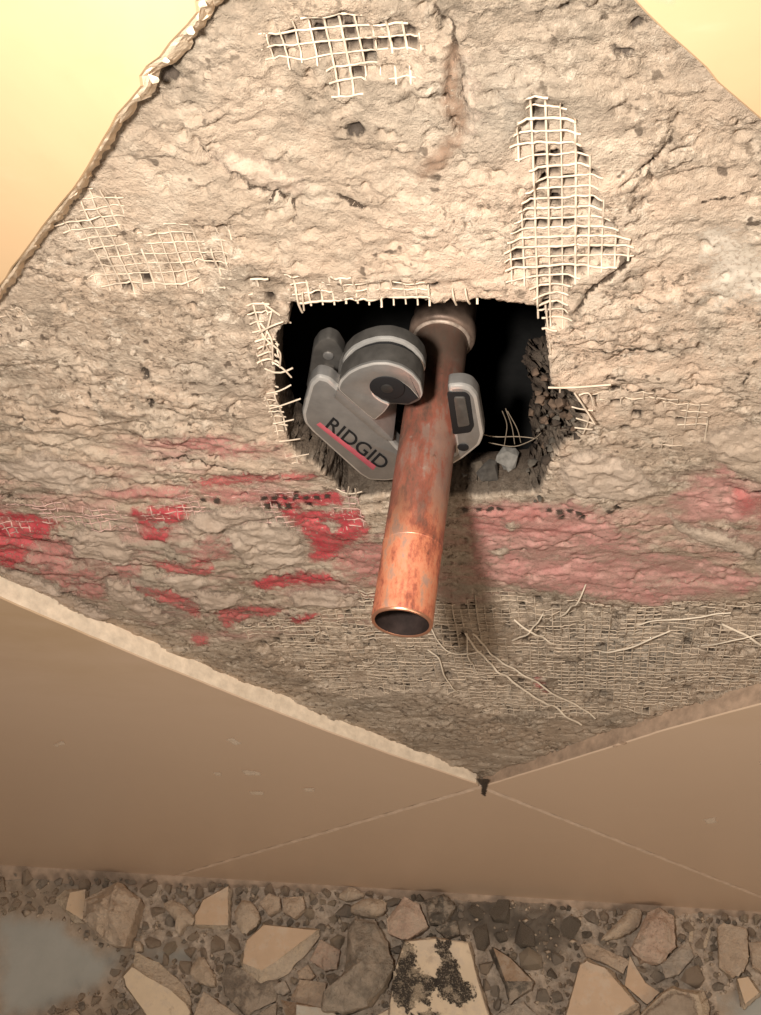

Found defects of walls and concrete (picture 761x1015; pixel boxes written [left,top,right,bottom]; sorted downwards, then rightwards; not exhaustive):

spalling [0,0,224,300]
crack [622,130,673,185]
crack [577,257,632,309]
spalling [518,367,580,481]